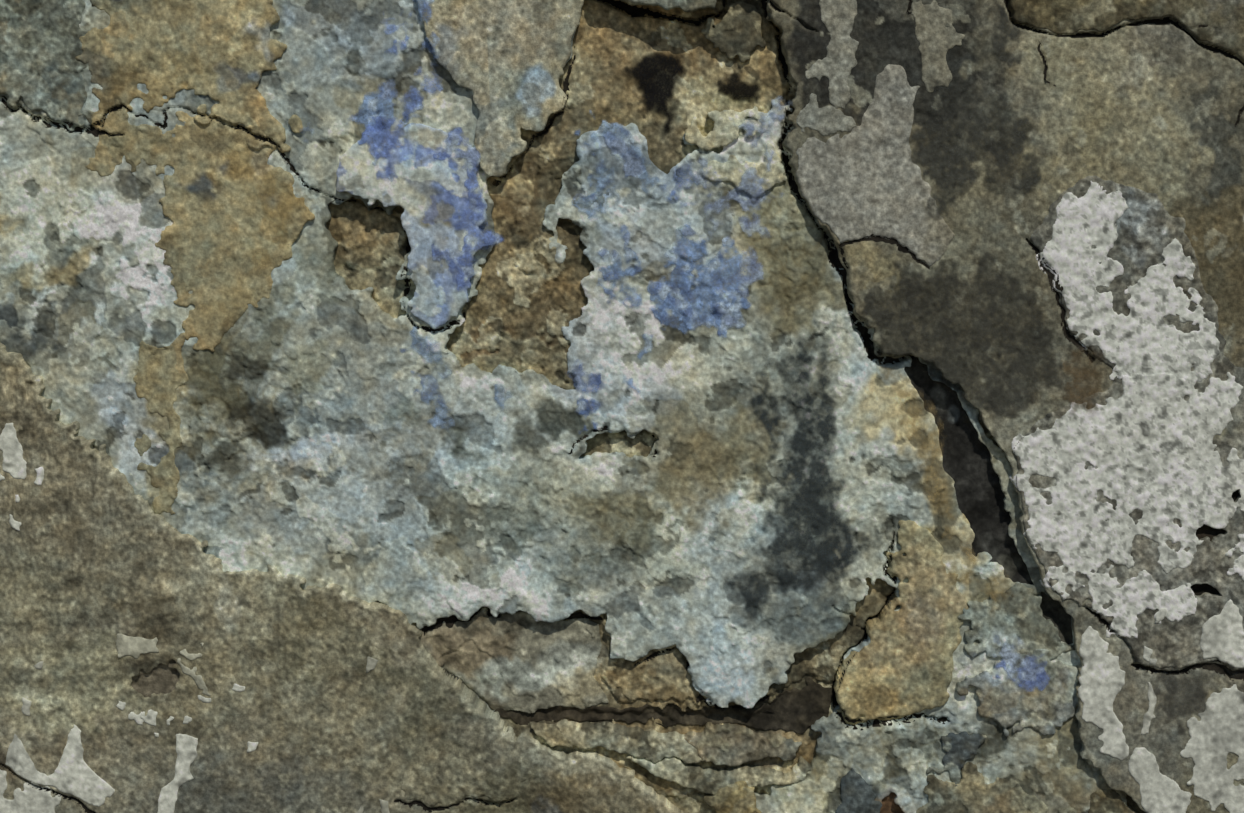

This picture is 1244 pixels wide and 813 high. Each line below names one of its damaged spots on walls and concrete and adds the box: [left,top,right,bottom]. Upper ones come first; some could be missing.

crack [1004,0,1244,86]
spalling [0,66,195,513]
crack [1,96,466,333]
spalling [160,0,1244,713]
crack [761,0,931,365]
crack [1026,238,1095,362]
peeling [0,725,115,813]
peeling [116,634,211,813]
crack [422,607,501,636]
spalling [494,620,1127,813]
crack [833,531,950,730]
peeling [1051,626,1244,813]